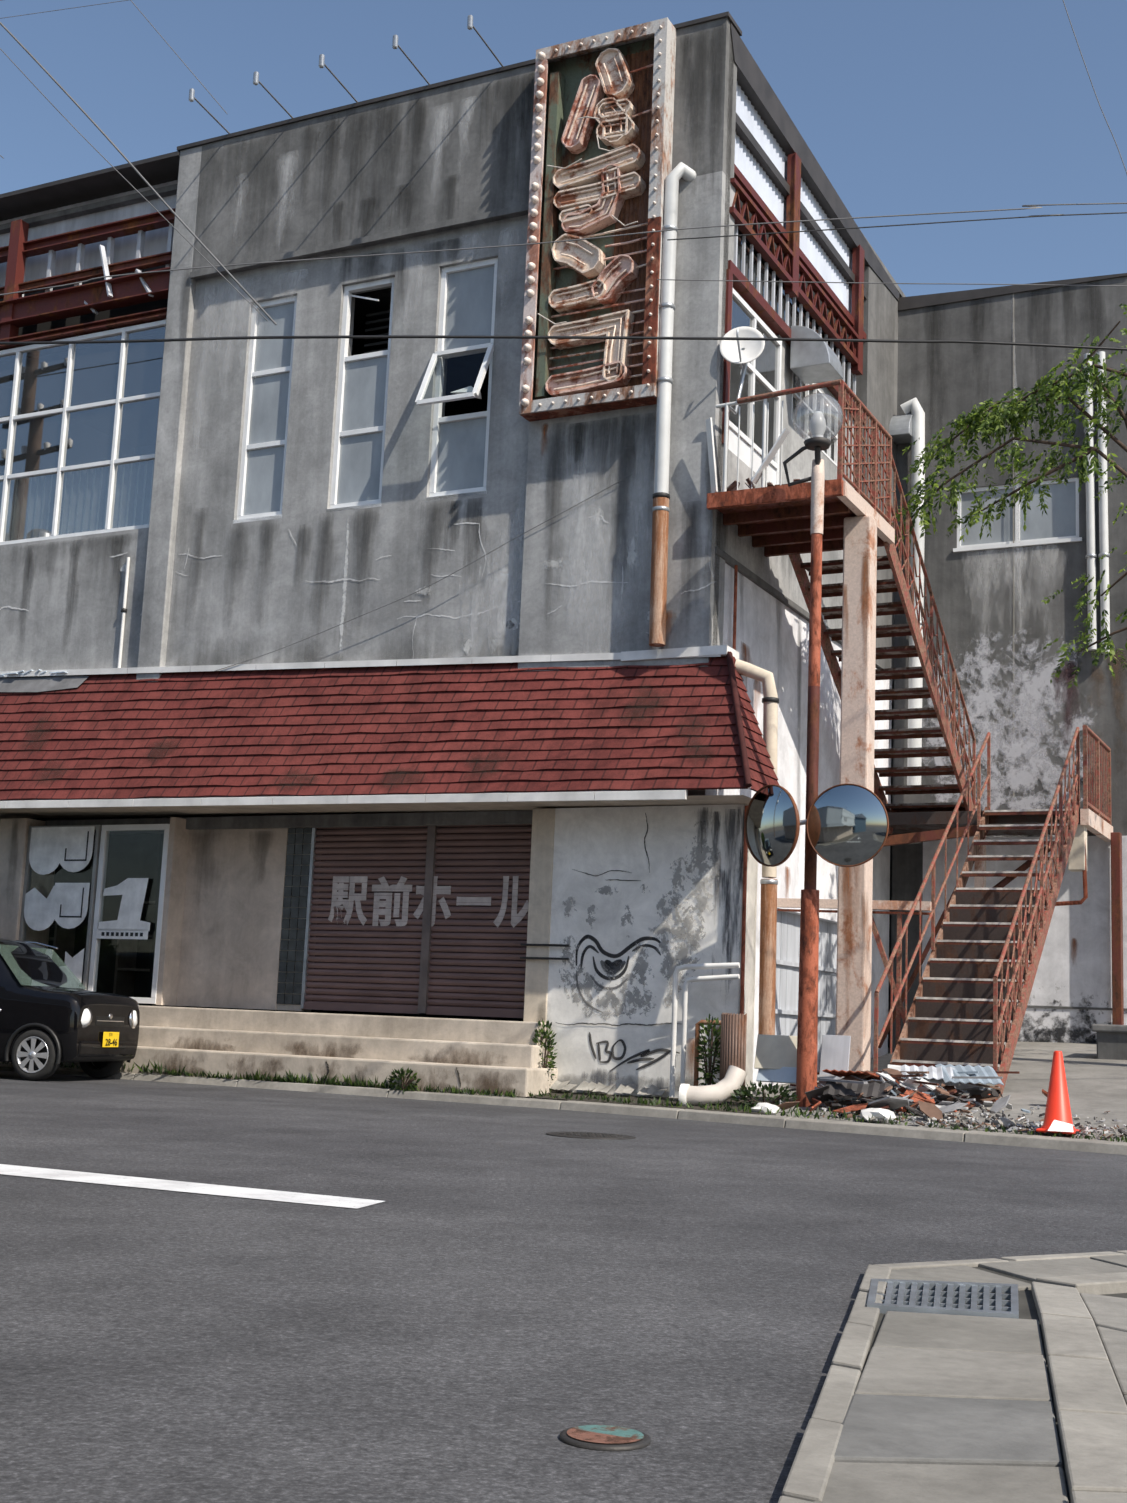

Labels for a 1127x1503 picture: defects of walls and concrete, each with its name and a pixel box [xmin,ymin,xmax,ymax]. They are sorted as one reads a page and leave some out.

leakage [339,515,370,651]
corrosion [844,555,869,620]
flaking render [922,631,1092,810]
peeling [559,823,720,1019]
corrosion [844,867,868,934]